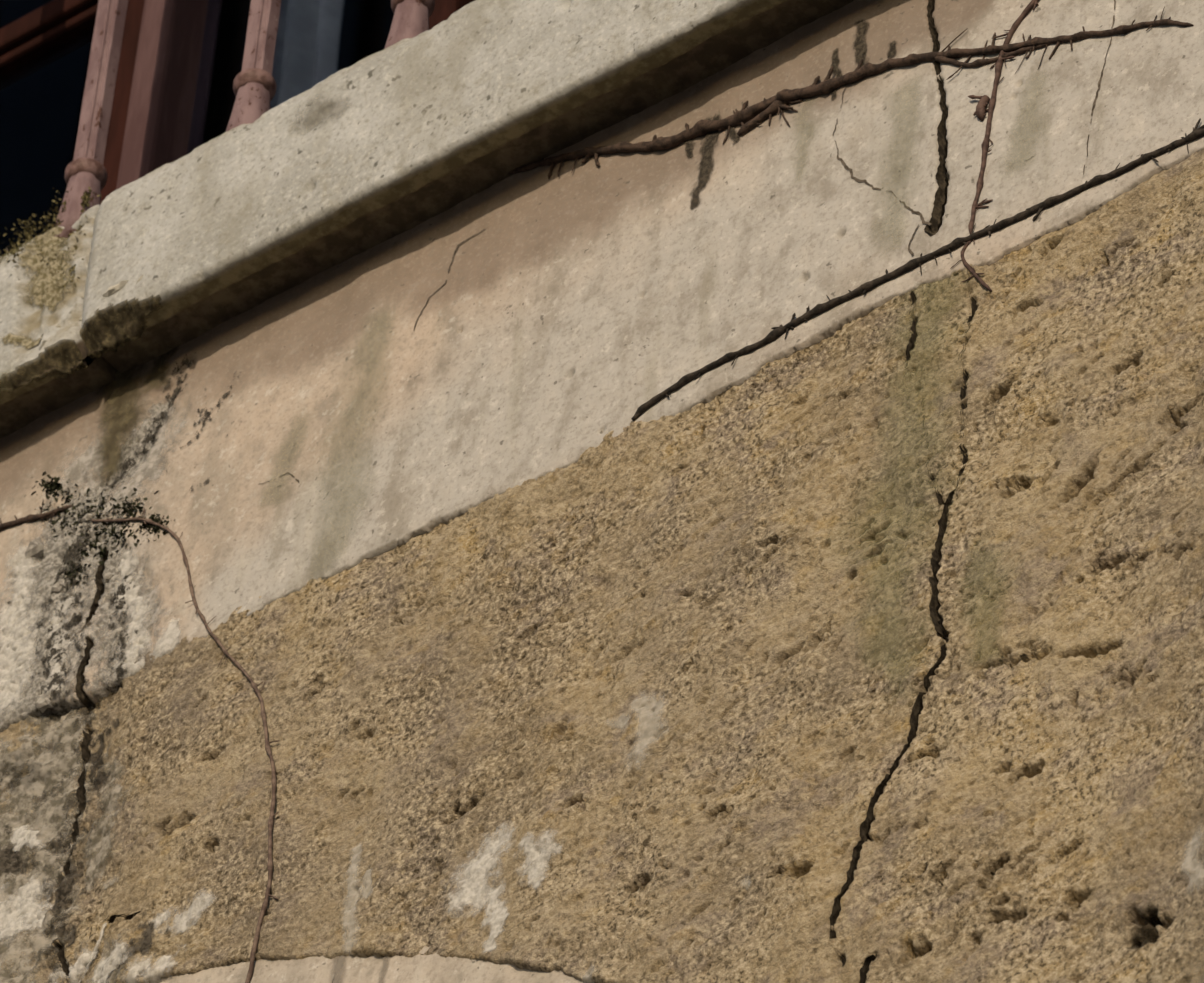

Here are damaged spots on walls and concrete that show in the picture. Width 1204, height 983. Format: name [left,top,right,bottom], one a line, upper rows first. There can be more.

crack [832,0,949,256]
crack [53,941,72,983]
crack [40,548,109,900]
damp [0,547,214,983]
crack [108,911,141,923]
damp [449,823,561,951]
crack [829,268,978,983]